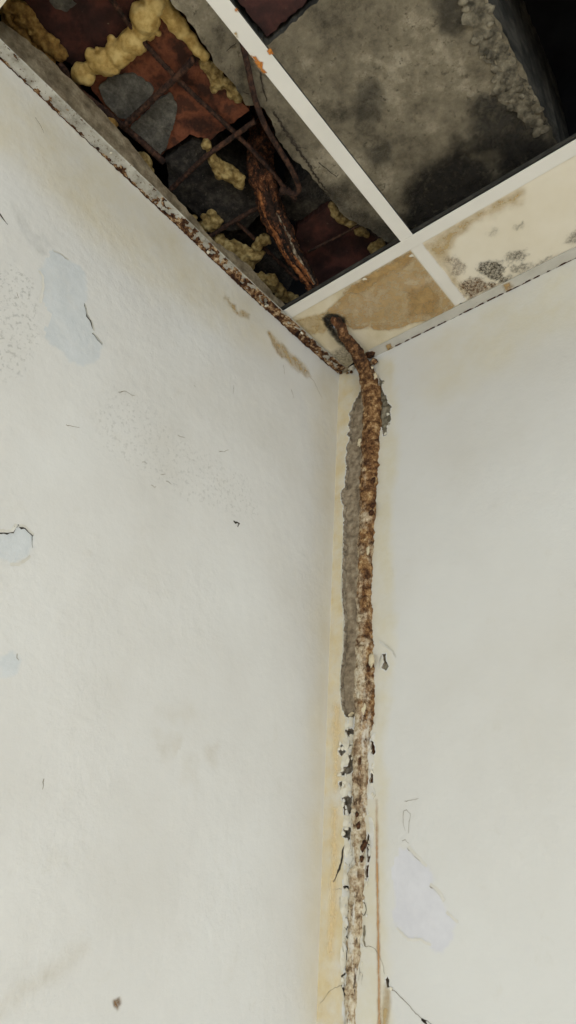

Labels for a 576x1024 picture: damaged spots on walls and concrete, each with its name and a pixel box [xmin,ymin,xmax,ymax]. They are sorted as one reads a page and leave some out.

peeling [0,248,106,392]
rust [0,48,345,373]
water stain [403,96,558,231]
water stain [461,251,525,298]
spalling [371,366,392,435]
peeling [0,522,37,570]
water stain [0,60,462,1024]
spalling [337,397,396,988]
water stain [355,259,576,1024]
rust [376,840,388,1024]
peeling [390,845,459,958]